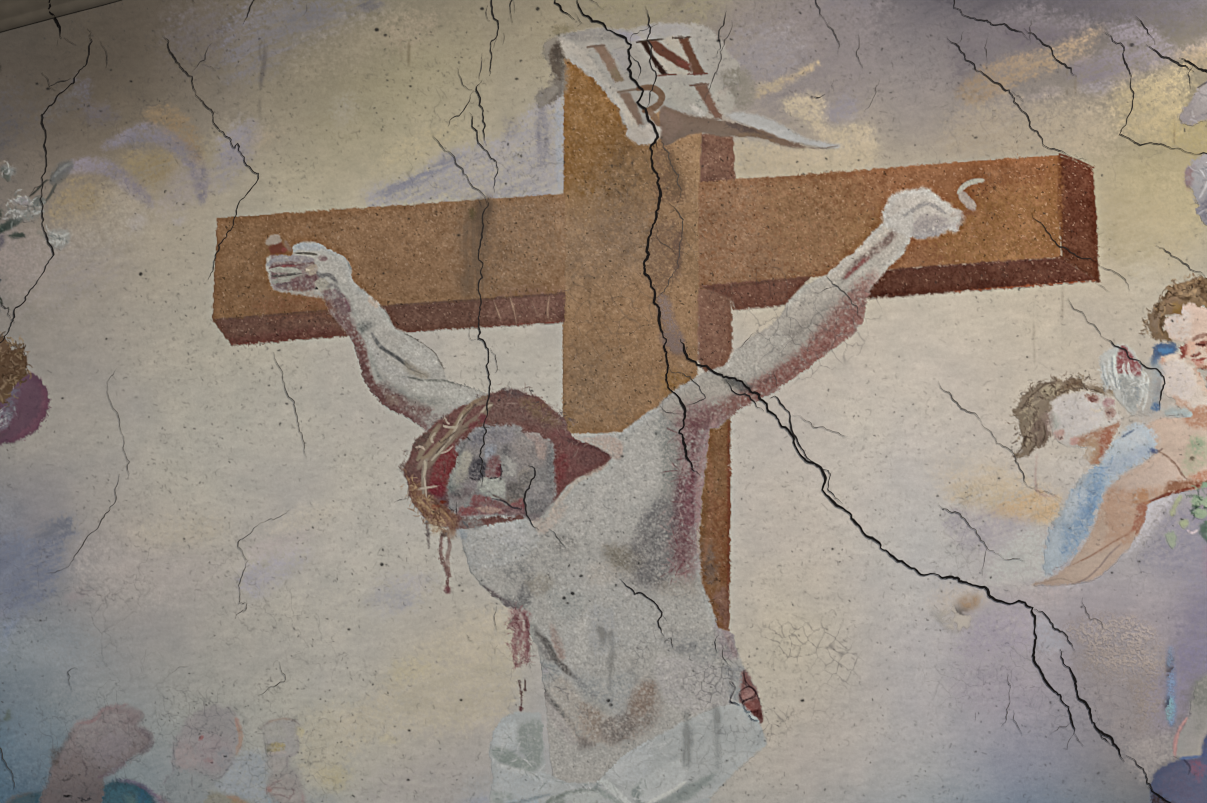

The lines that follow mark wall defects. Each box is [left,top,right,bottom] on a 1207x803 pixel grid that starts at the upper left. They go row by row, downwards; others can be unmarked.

crack [0,0,108,343]
crack [166,38,259,279]
crack [435,0,515,482]
crack [1105,19,1207,154]
crack [50,374,130,573]
crack [523,465,564,545]
crack [554,0,1171,803]